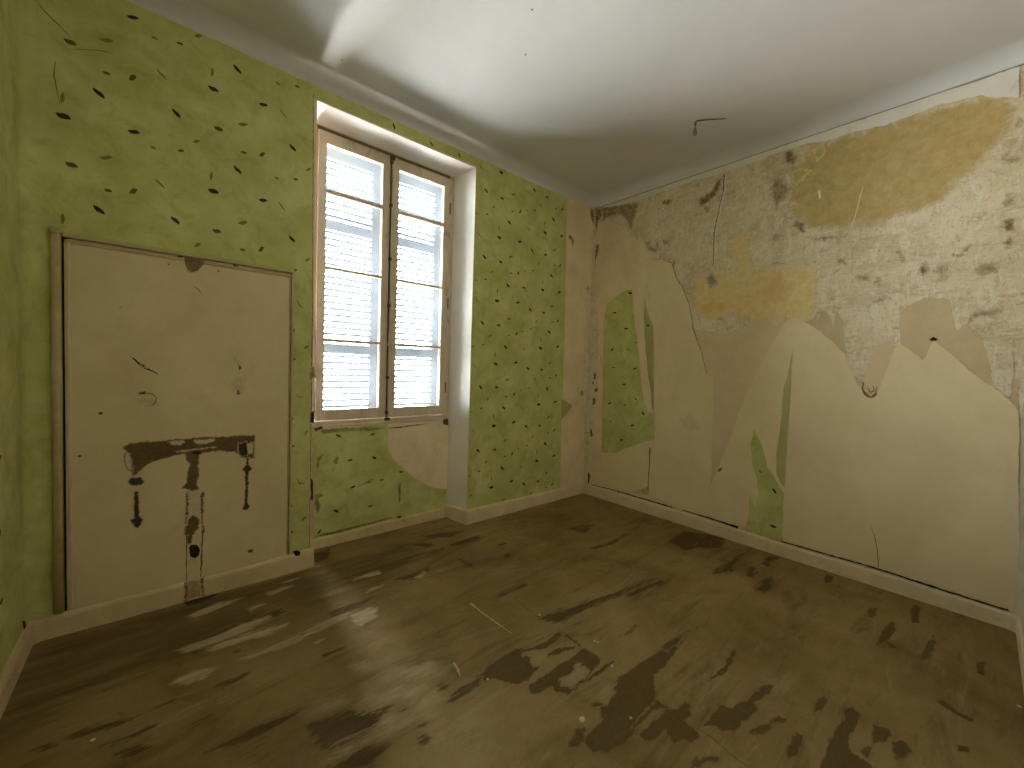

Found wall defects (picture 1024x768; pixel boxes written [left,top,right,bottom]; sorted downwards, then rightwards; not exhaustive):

leakage [589,200,641,231]
crack [713,174,726,262]
peeling [184,257,204,272]
flaking render [587,219,655,494]
crack [663,259,707,373]
peeling [802,311,847,358]
peeling [862,293,993,398]
spalling [237,441,248,457]